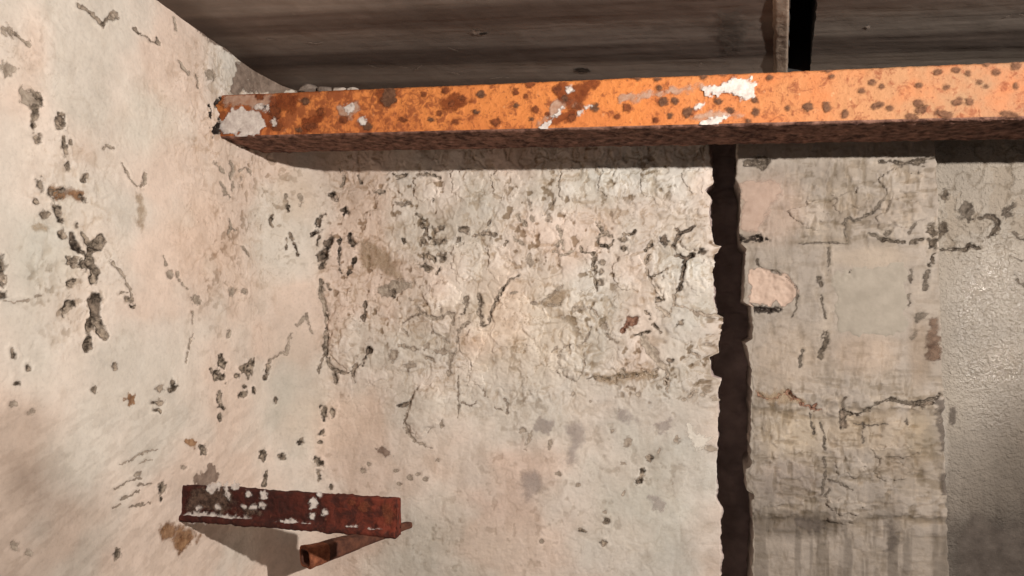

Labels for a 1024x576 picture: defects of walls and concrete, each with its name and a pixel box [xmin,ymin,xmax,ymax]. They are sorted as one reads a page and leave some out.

rust [255,93,325,135]
rust [428,87,485,124]
rust [513,80,600,124]
rust [653,77,693,123]
rust [906,62,1021,120]
spalling [33,180,109,353]
crack [268,169,441,385]
peeling [402,168,522,312]
flaking render [748,268,799,307]
crack [397,198,724,449]
crack [756,199,1024,497]
rust [160,523,201,555]